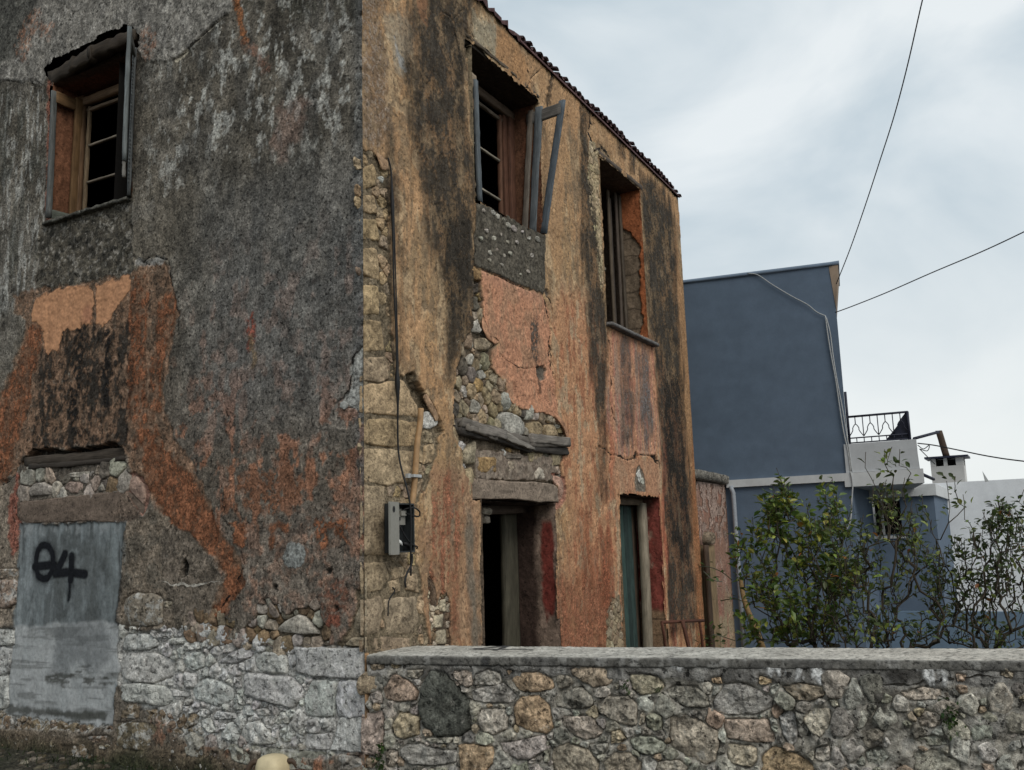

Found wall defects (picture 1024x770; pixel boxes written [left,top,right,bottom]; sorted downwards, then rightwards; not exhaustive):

flaking render [31,275,131,354]
flaking render [17,458,150,516]
leakage [32,315,136,454]
flaking render [183,150,569,656]
leakage [406,0,476,369]
leakage [580,109,608,493]
crack [599,446,660,479]
leakage [618,140,697,634]